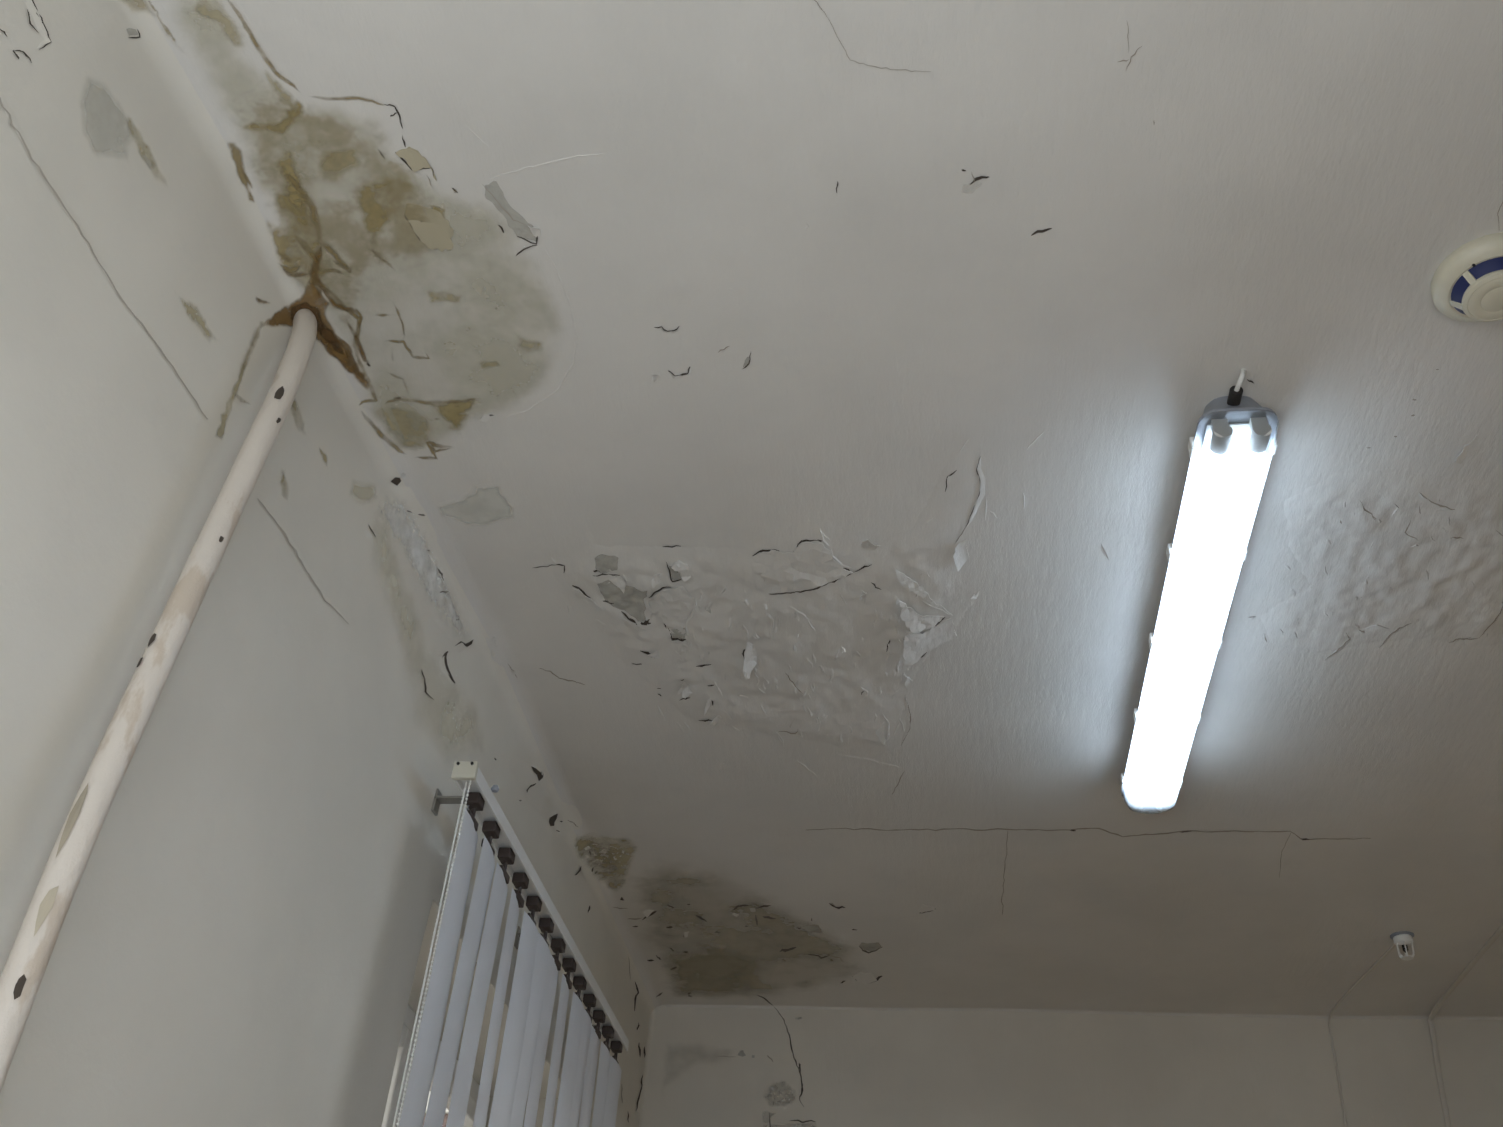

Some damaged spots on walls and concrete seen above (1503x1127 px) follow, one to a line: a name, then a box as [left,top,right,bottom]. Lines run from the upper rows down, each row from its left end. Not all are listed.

crack [0,0,51,63]
water stain [199,7,301,133]
water stain [230,144,253,201]
crack [0,92,208,419]
water stain [273,153,351,293]
water stain [358,182,390,256]
water stain [217,367,244,437]
water stain [360,393,472,459]
peeling [953,540,969,571]
peeling [886,569,957,692]
crack [777,696,1371,915]
flaking render [762,1080,817,1127]